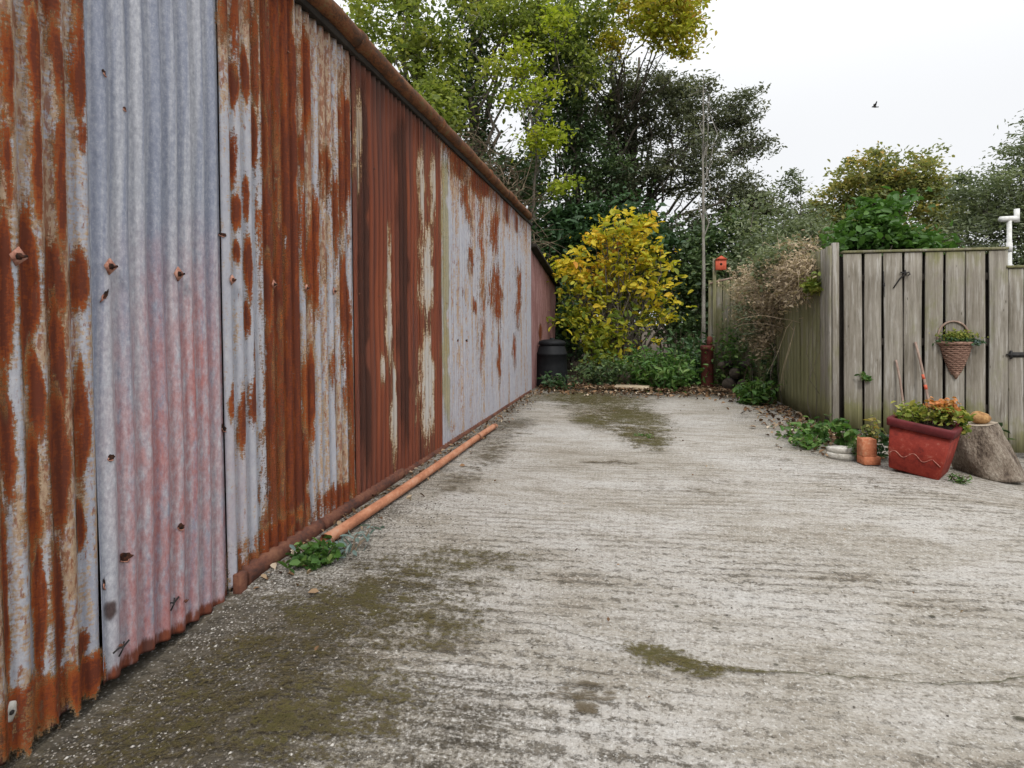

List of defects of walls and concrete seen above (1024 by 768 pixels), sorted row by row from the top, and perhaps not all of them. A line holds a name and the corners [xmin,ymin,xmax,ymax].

corrosion [0,0,107,766]
corrosion [215,0,357,586]
corrosion [436,135,522,390]